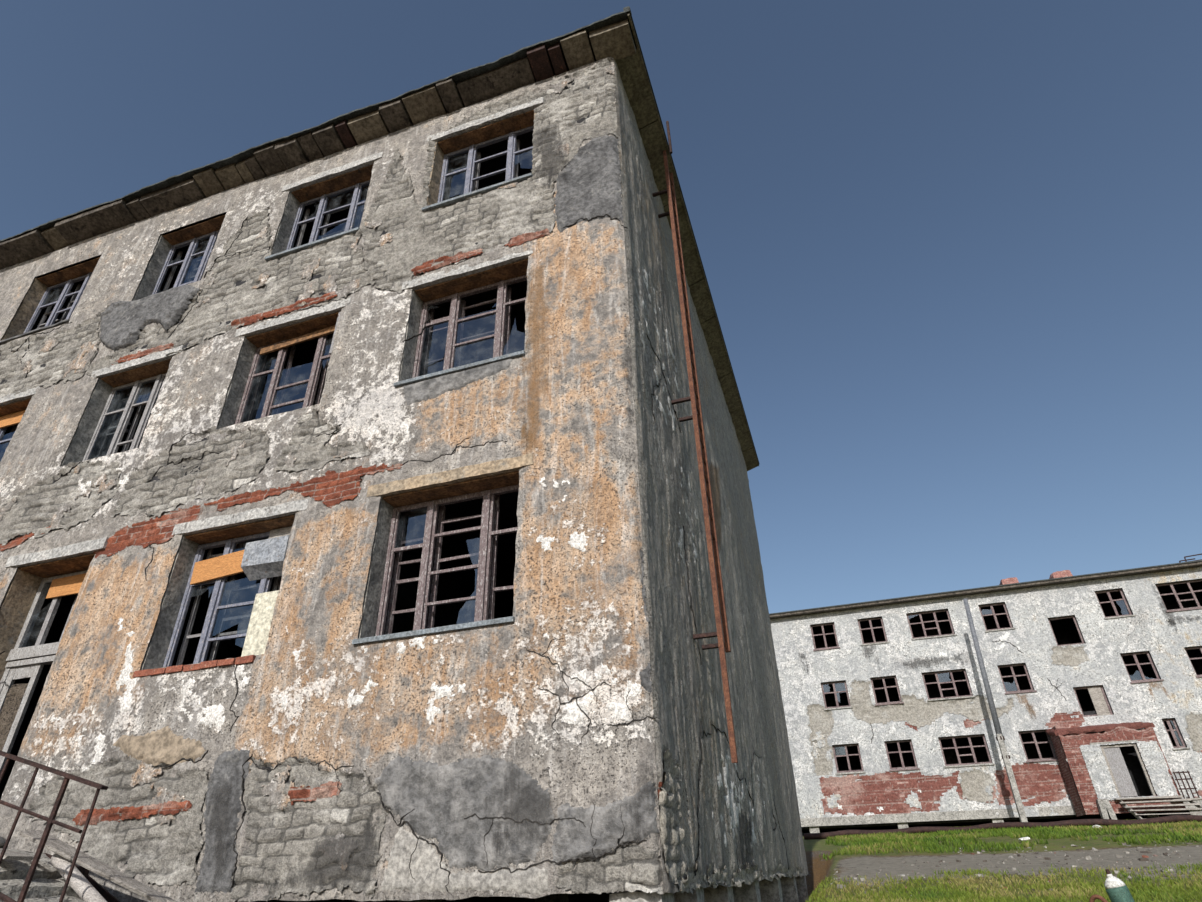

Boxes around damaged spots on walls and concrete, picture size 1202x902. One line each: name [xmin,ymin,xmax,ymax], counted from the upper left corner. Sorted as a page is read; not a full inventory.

spalling [0,57,619,397]
spalling [0,409,415,559]
crack [402,438,507,465]
peeling [536,531,589,552]
crack [229,665,239,731]
crack [525,638,659,746]
crack [158,750,208,768]
flaking render [807,704,1070,816]
crack [229,754,354,892]
spalling [230,757,389,902]
crack [376,792,647,892]
spalling [555,749,805,894]